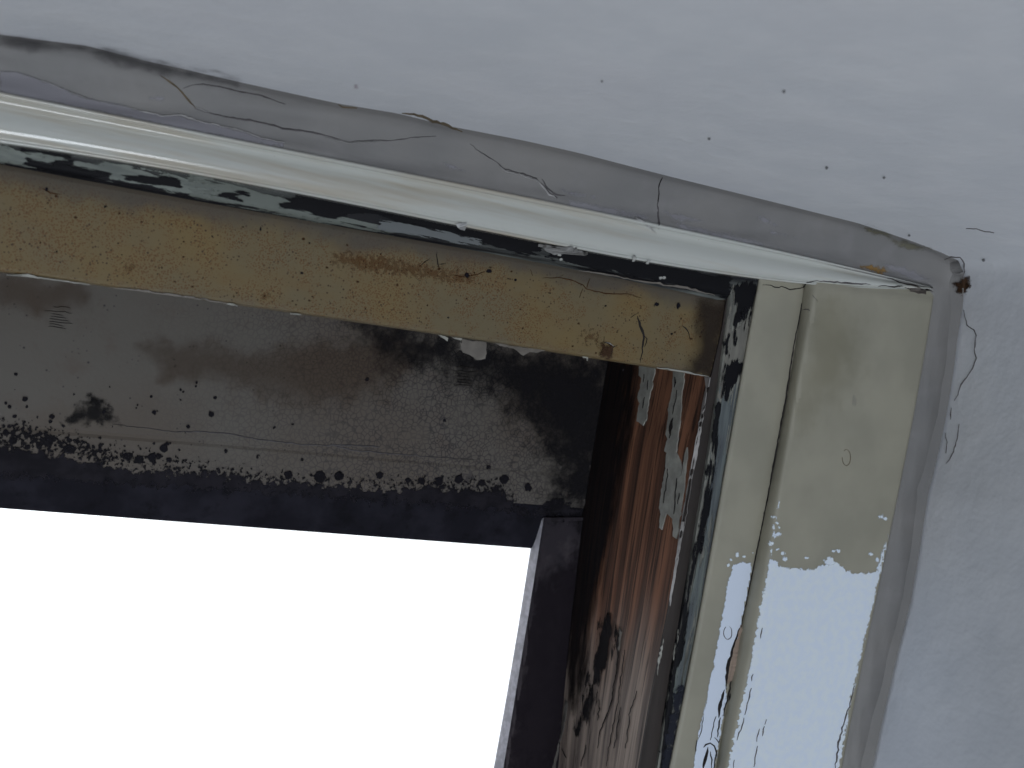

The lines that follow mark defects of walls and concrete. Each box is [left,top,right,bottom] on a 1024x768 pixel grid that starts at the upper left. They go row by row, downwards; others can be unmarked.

crack [161,76,565,199]
crack [635,177,663,233]
crack [530,269,647,362]
rust [952,276,971,293]
crack [945,313,977,464]
peeling [0,145,757,768]
damp [0,324,636,768]